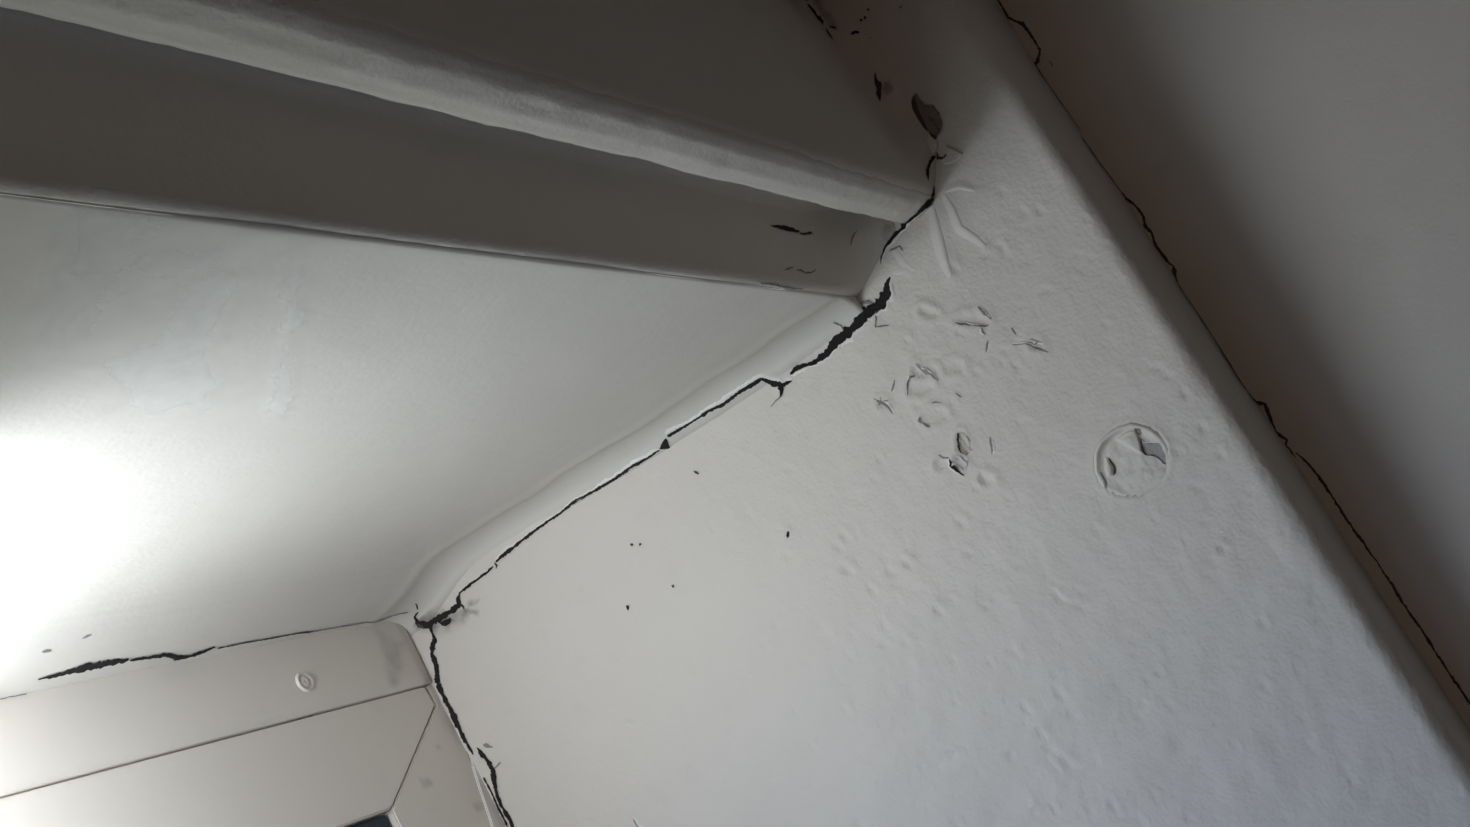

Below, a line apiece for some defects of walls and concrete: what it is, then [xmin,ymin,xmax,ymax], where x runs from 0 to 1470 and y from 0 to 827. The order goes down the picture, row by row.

flaking render [911,93,963,165]
crack [955,306,1049,353]
crack [997,0,1470,705]
crack [874,362,963,476]
peeling [955,433,972,471]
crack [988,437,996,454]
crack [1,153,946,827]